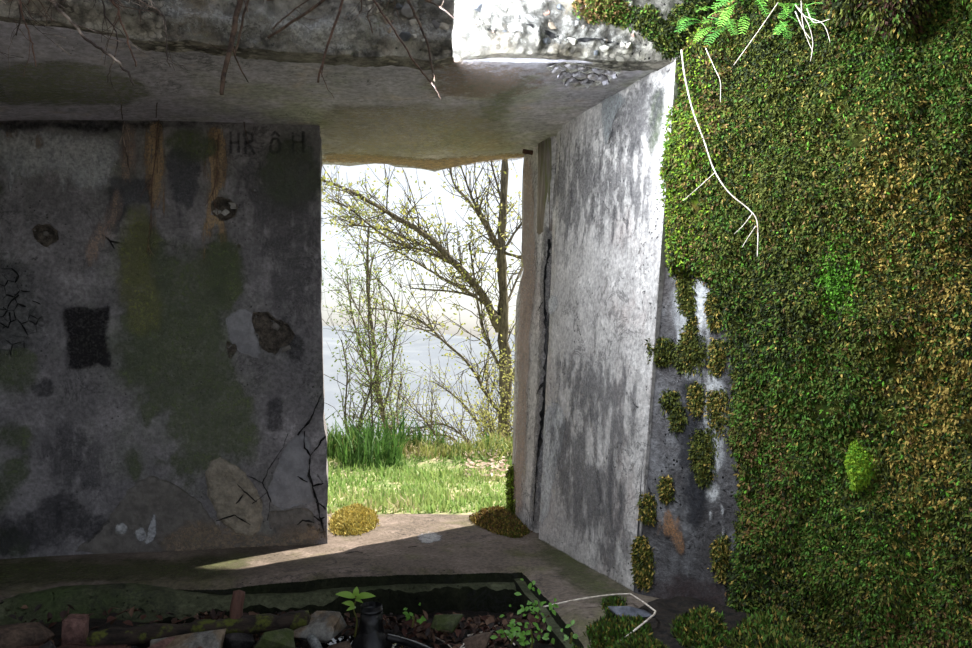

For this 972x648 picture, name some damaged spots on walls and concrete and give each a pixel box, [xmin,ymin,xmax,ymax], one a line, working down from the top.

water stain [608,74,665,152]
spalling [211,197,238,221]
crack [0,268,41,355]
spalling [226,309,295,359]
crack [533,239,551,521]
crack [247,394,326,538]